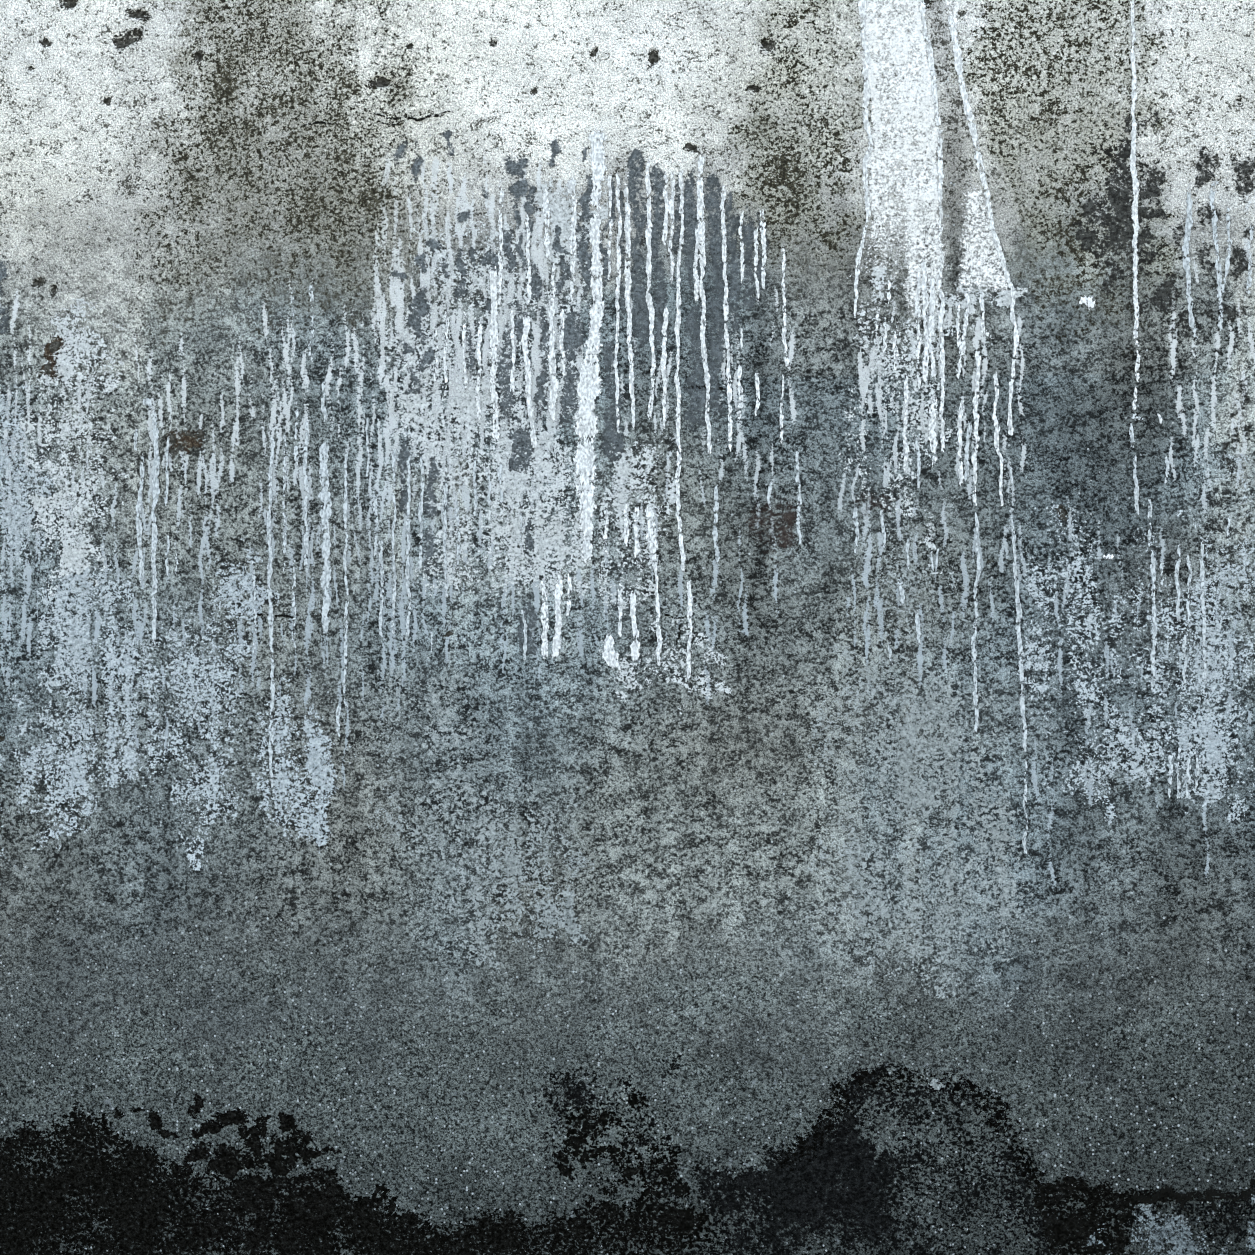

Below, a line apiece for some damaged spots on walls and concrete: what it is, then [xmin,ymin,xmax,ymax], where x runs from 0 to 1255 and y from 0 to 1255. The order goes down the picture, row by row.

damp [290,278,314,362]
damp [373,128,732,714]
damp [720,185,767,452]
damp [780,246,790,443]
damp [804,0,1255,999]
damp [0,299,596,969]
damp [0,1062,1255,1255]
crack [1127,1175,1255,1232]